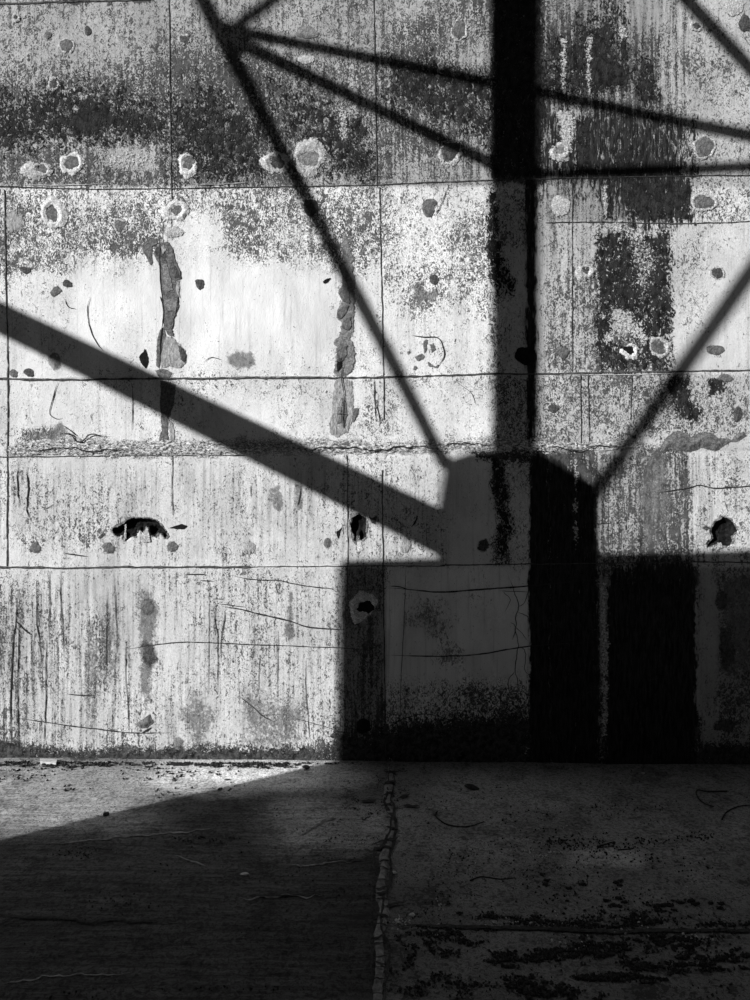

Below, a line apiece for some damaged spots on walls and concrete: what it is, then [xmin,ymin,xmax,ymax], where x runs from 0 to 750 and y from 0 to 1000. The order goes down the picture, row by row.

spalling [19,151,84,181]
spalling [178,152,197,179]
damp [0,71,385,194]
spalling [259,137,326,178]
damp [376,0,727,424]
peeling [139,236,186,447]
peeling [323,231,358,437]
spalling [98,516,187,543]
spalling [336,513,377,552]
damp [0,361,750,764]
spalling [696,516,738,549]
crack [344,765,419,1000]